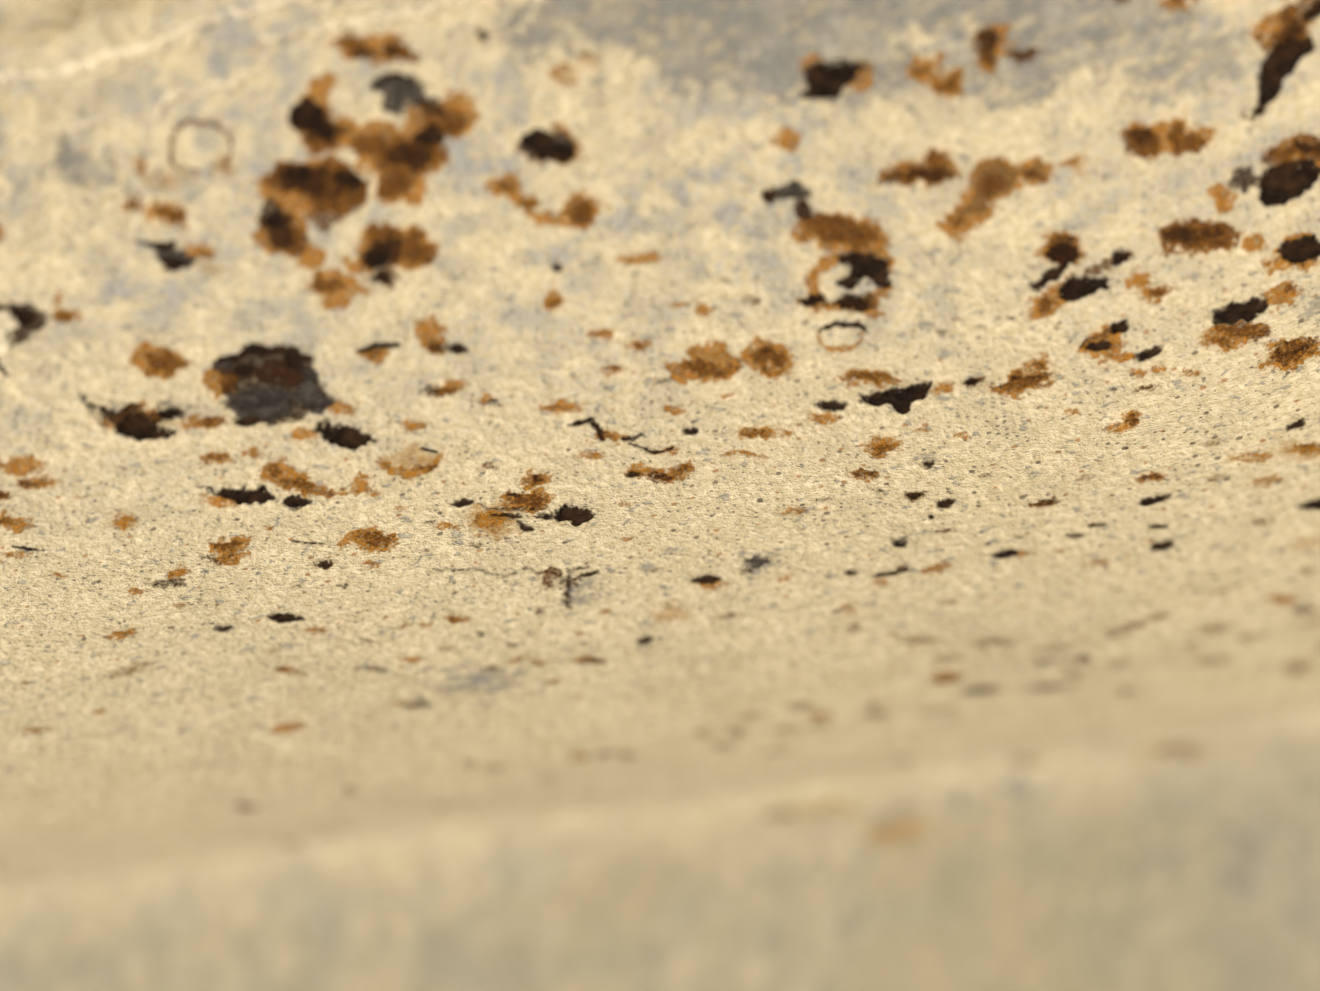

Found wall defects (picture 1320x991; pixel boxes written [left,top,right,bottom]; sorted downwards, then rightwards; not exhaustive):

peeling [370,71,424,116]
peeling [494,0,1248,112]
crack [1239,36,1316,121]
peeling [518,122,586,166]
corrosion [1119,113,1217,162]
corrosion [251,71,482,310]
corrosion [760,180,893,258]
corrosion [875,147,1082,243]
corrosion [1158,132,1320,259]
peeling [81,342,376,450]
corrosion [654,336,802,399]
peeling [808,368,985,425]